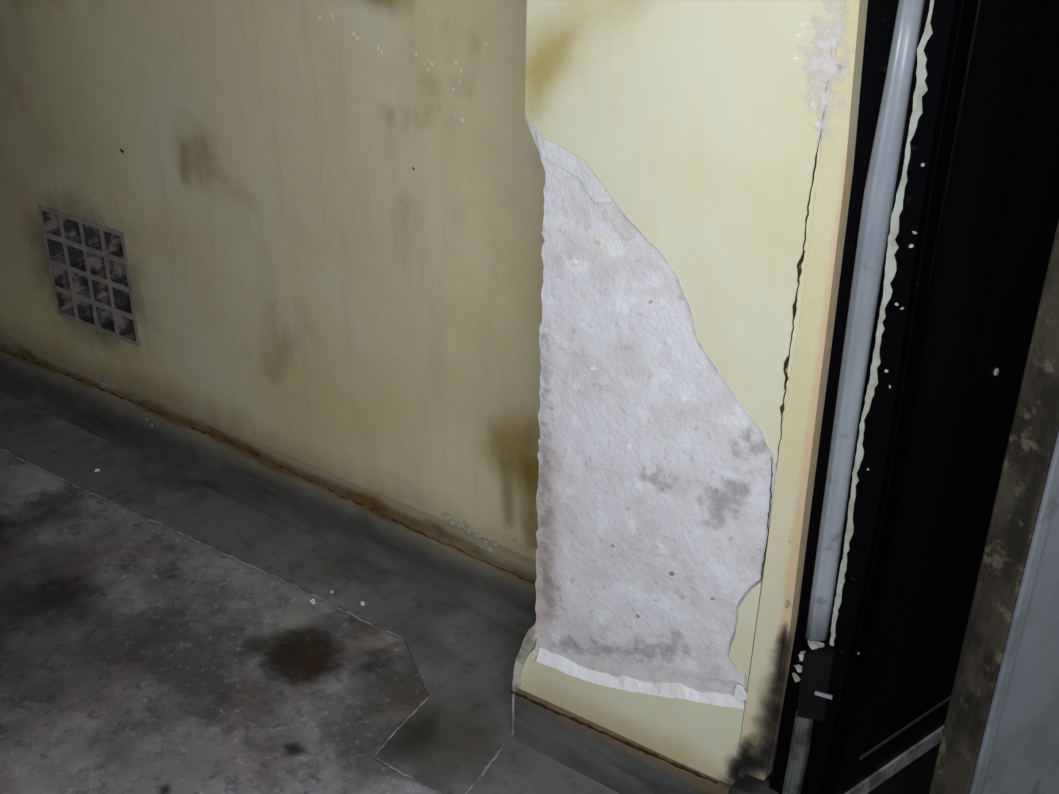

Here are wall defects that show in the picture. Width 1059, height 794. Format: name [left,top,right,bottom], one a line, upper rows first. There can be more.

flaking render [525,117,776,709]
crack [751,82,828,589]
damp [726,630,787,786]